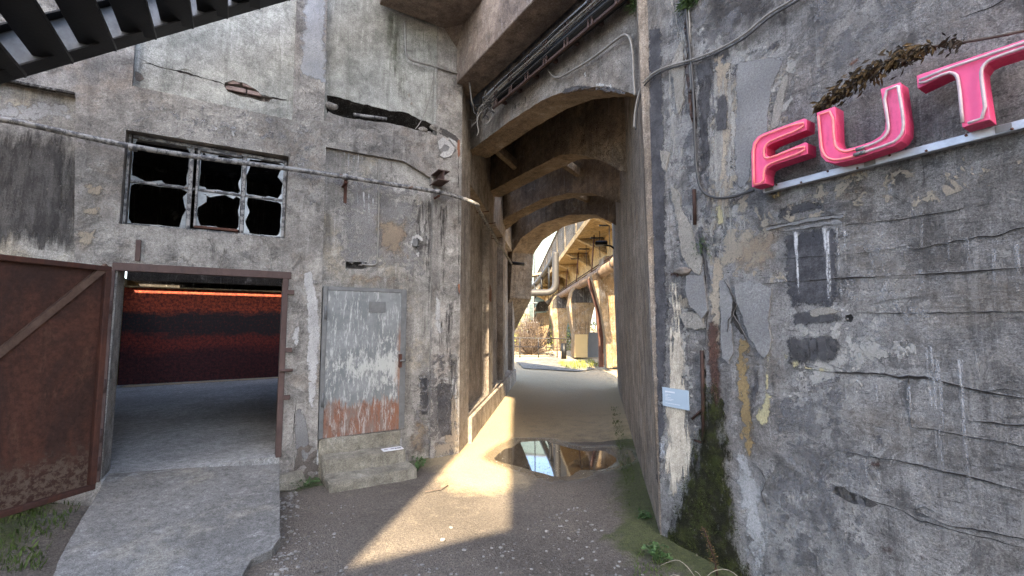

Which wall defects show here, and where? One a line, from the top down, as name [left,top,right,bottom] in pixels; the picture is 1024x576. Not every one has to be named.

crack [138,58,286,102]
peeling [671,38,685,114]
spalling [326,94,460,158]
peeling [660,150,670,172]
spalling [713,54,732,213]
peeling [670,186,724,444]
leakage [648,0,993,576]
spalling [736,338,755,457]
crack [802,368,1024,447]
crack [841,450,1024,491]
crack [853,493,1024,548]